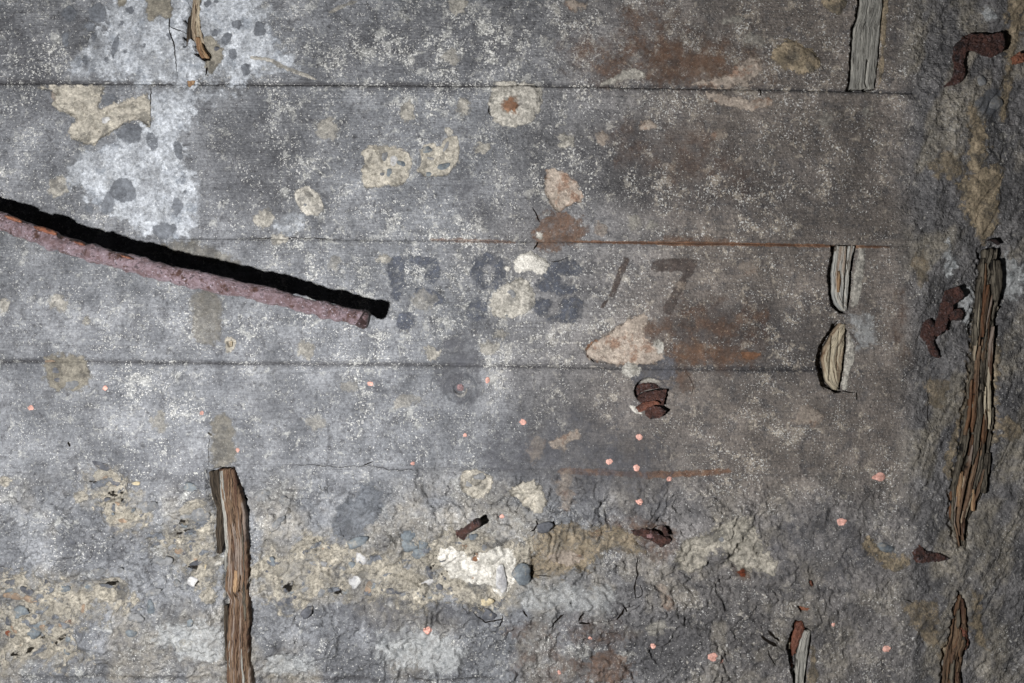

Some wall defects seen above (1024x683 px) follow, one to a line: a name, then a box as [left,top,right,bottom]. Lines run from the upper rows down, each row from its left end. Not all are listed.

rust [578,9,724,81]
peeling [84,178,136,214]
peeling [153,190,186,239]
rust [533,212,833,252]
rust [0,211,371,329]
crack [530,521,555,579]
crack [461,600,590,628]
crack [616,558,643,620]